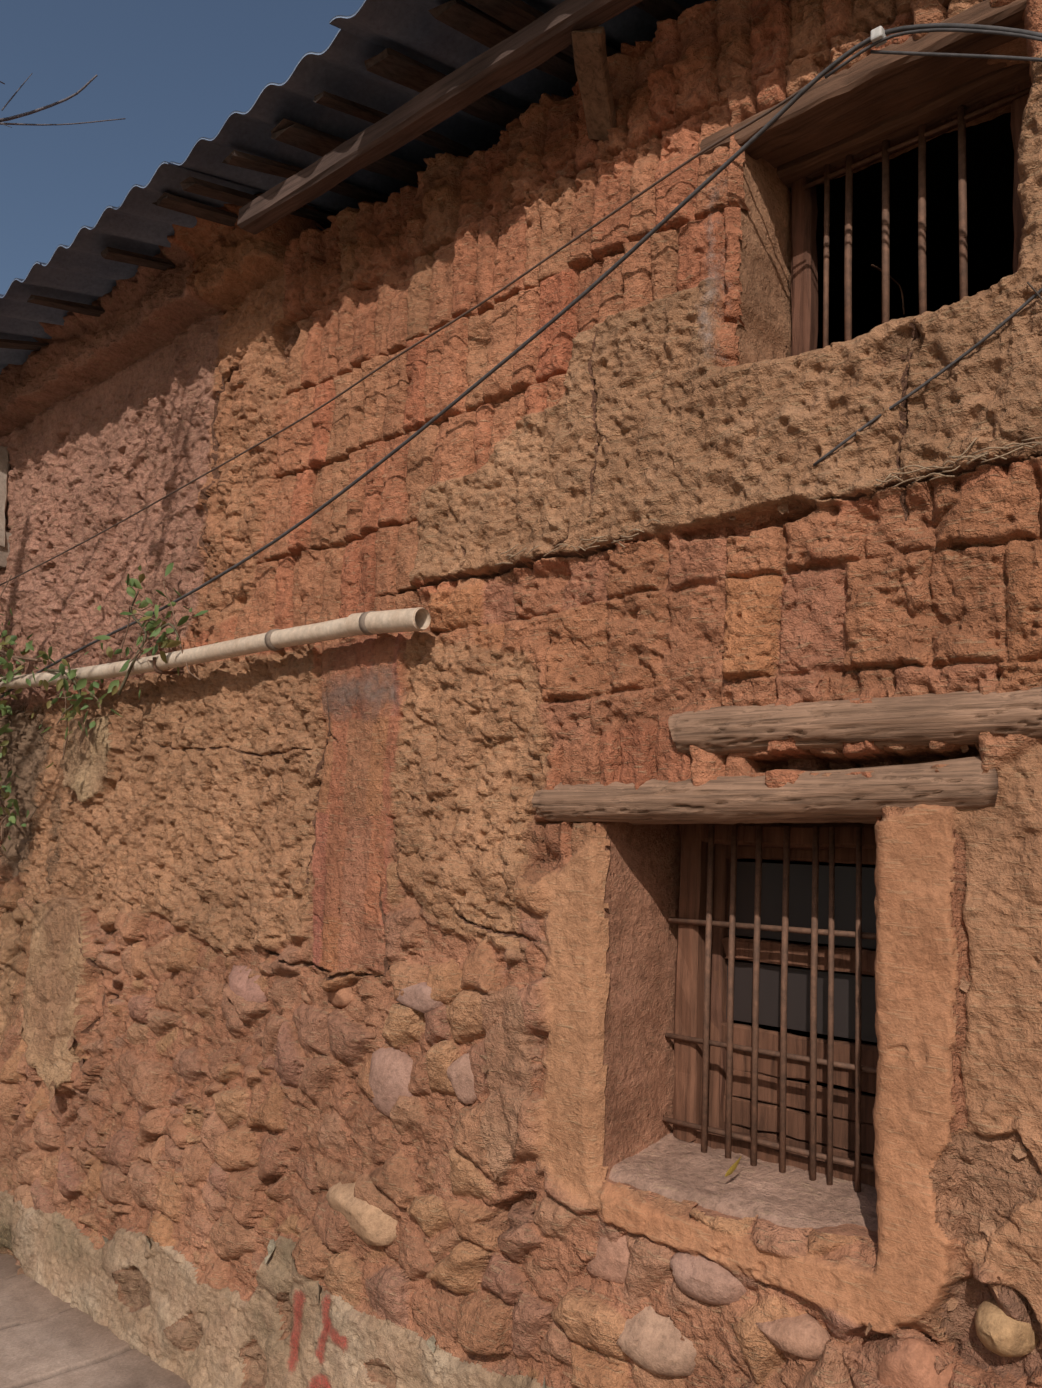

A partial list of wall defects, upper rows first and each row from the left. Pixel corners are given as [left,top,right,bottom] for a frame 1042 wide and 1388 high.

crack [380,330,667,597]
crack [815,318,1042,520]